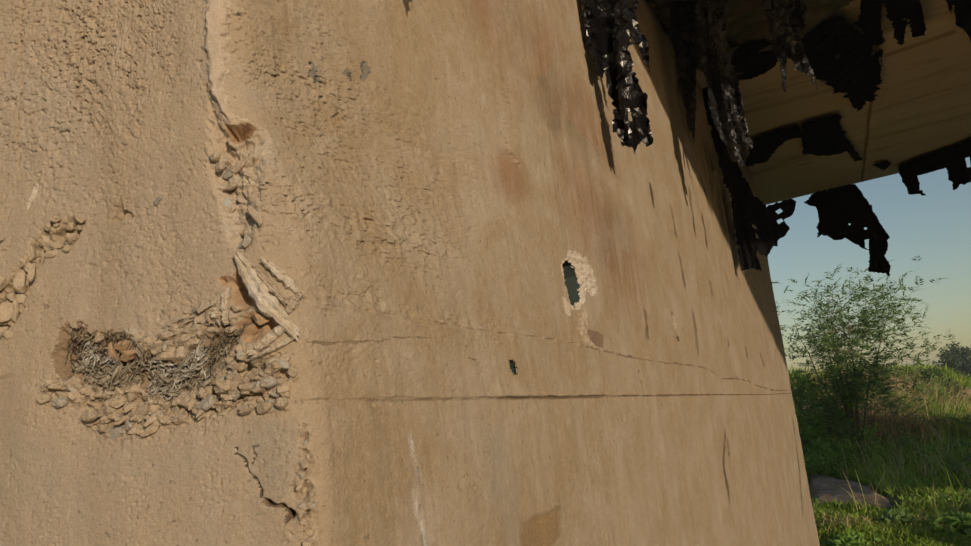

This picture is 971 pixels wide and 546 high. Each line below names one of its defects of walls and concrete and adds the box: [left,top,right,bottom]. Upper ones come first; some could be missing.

spalling [35,0,305,440]
spalling [560,249,597,310]
crack [306,336,432,346]
crack [496,346,792,400]
crack [234,445,296,522]
spalling [291,422,319,546]